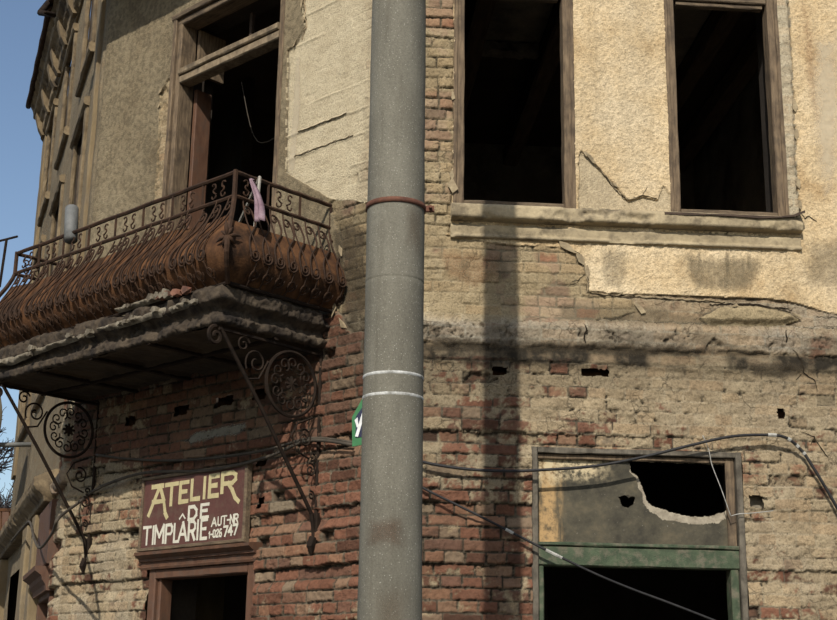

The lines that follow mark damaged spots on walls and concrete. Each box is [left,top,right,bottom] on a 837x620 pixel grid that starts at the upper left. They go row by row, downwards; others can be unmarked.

spalling [423,0,646,324]
flaking render [578,151,671,211]
spalling [0,286,199,366]
crack [569,251,817,388]
leakage [434,339,511,350]
leakage [522,342,710,355]
spalling [492,366,508,375]
spalling [581,368,609,377]
leakage [754,364,799,376]